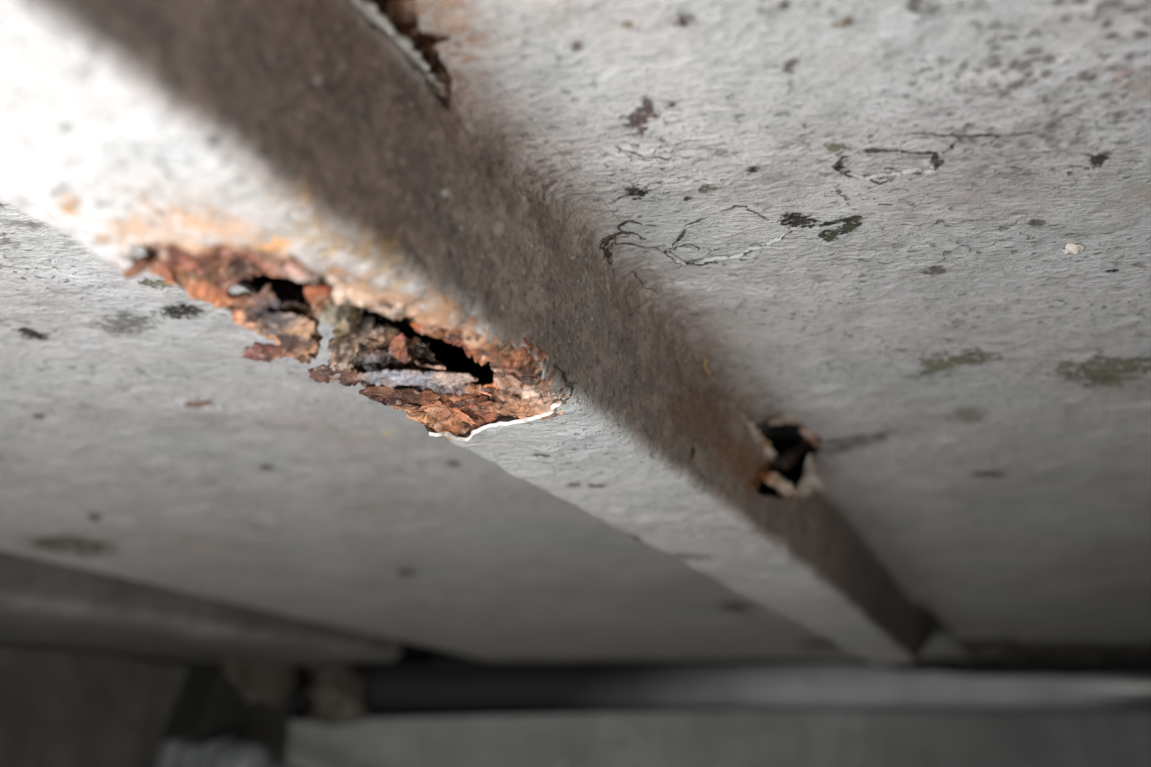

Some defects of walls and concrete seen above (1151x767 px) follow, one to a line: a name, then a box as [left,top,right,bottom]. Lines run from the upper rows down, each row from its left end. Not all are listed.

corrosion [365,0,487,88]
crack [614,146,689,163]
crack [832,132,1032,185]
peeling [122,257,154,279]
crack [599,205,792,294]
peeling [241,311,319,364]
corrosion [144,236,570,440]
peeling [356,321,479,407]